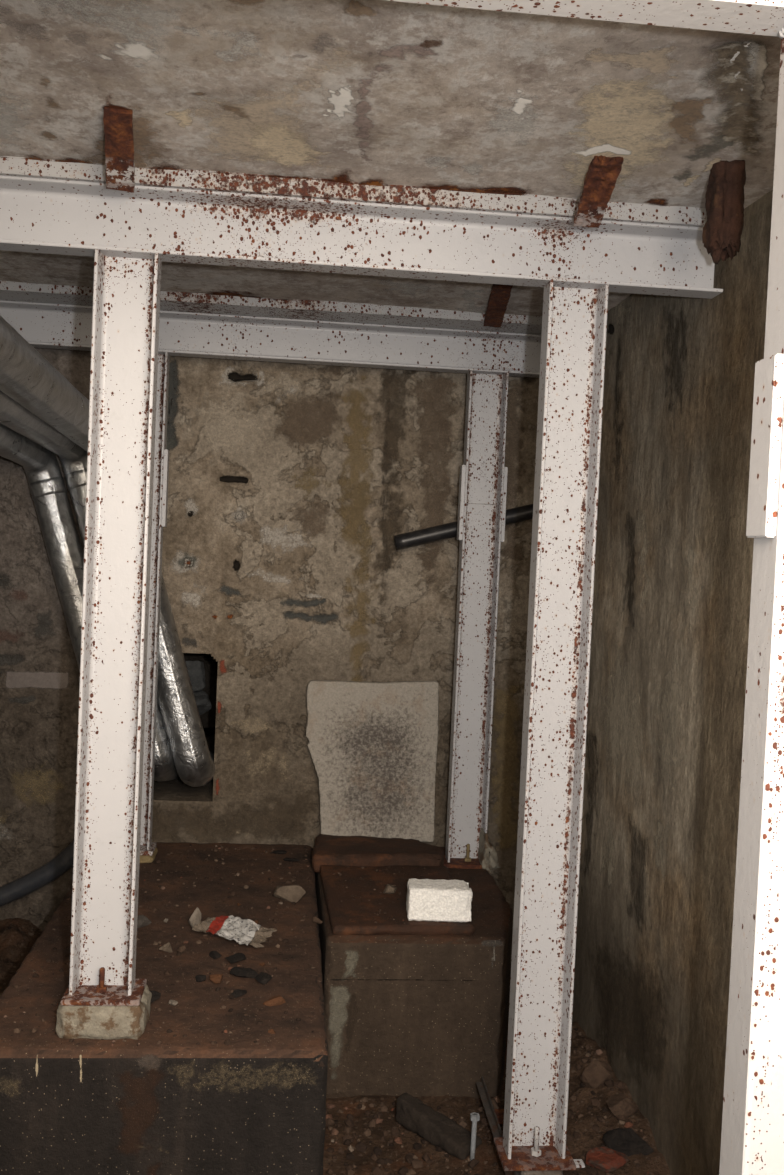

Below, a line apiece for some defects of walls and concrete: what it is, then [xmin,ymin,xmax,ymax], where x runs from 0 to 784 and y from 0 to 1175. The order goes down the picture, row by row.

rust [25,155,93,164]
rust [249,171,390,187]
rust [418,185,530,196]